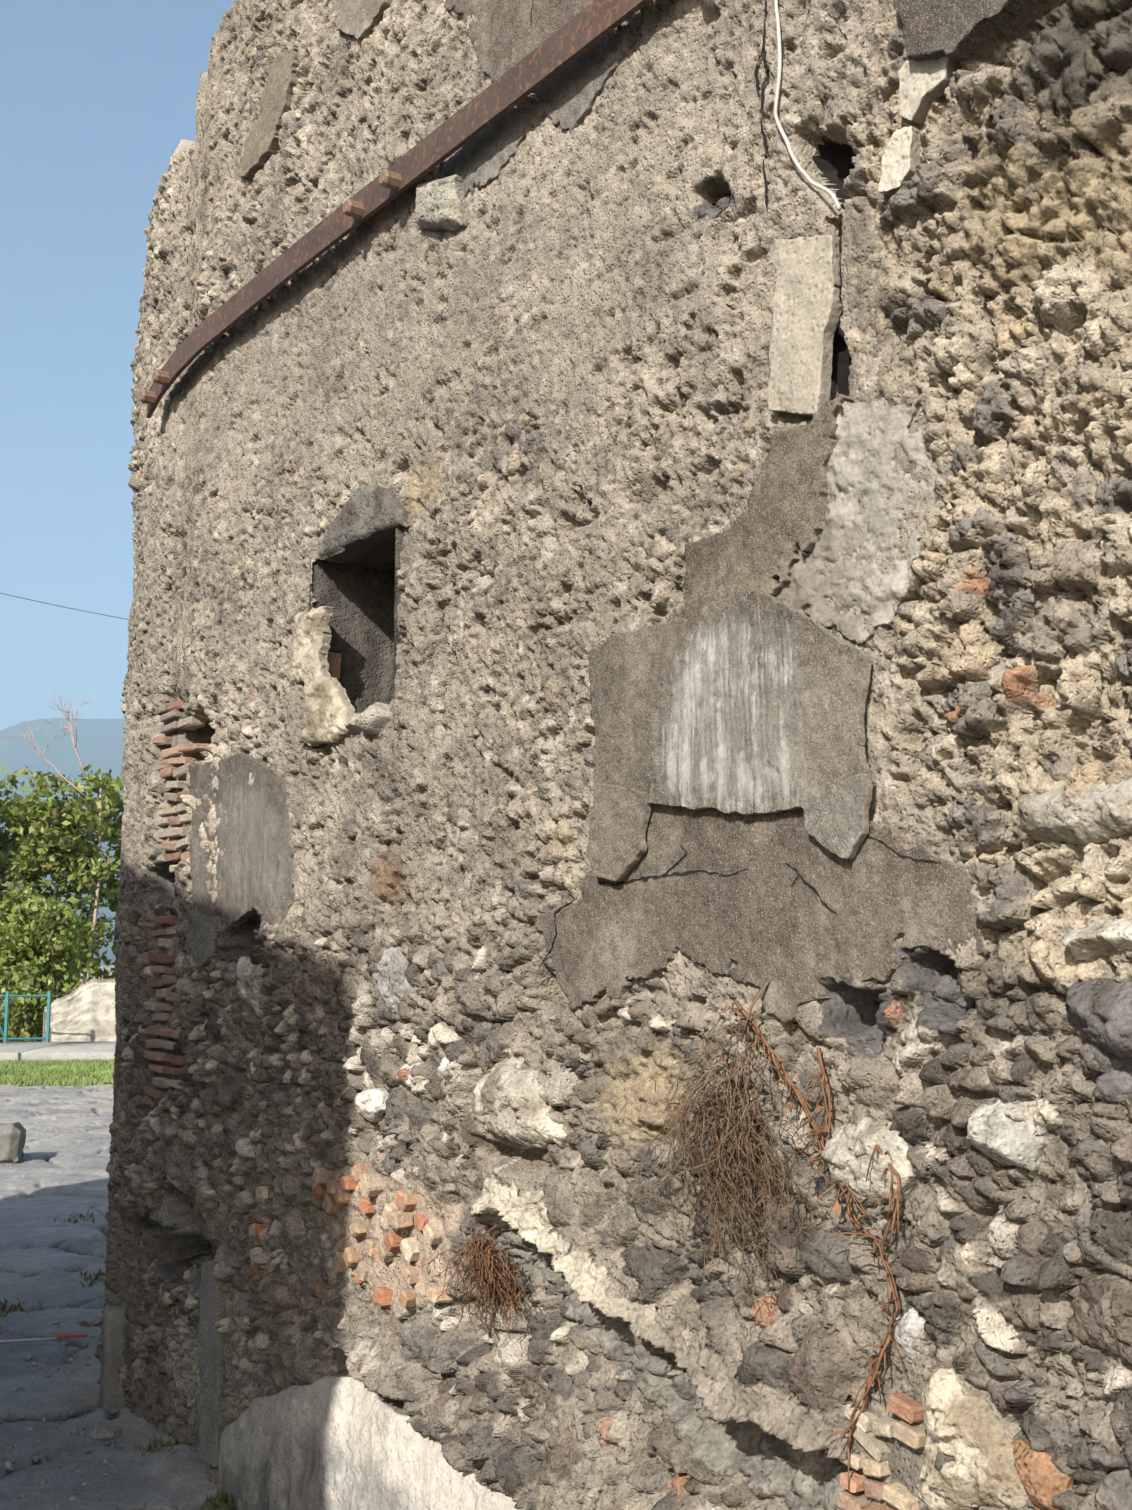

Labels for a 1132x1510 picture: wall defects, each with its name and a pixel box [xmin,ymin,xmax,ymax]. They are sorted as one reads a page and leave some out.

crack [754,0,769,211]
crack [812,132,857,397]
crack [538,845,749,971]
crack [785,863,836,913]
spalling [1086,1041,1132,1097]
flaking render [136,1161,525,1510]
spalling [483,1227,927,1510]
spalling [1086,1450,1132,1510]